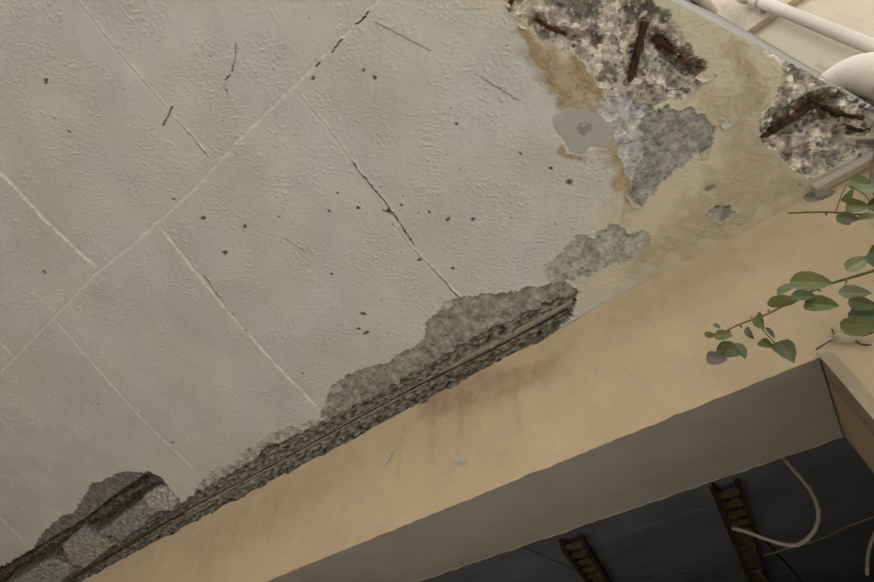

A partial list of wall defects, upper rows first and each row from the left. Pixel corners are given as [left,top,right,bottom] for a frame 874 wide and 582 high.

crack [222,42,237,92]
crack [314,11,369,67]
rust [528,37,605,102]
crack [162,106,207,155]
spalling [503,0,735,209]
spalling [756,50,874,178]
crack [351,161,414,244]
crack [203,275,247,331]
crack [428,265,459,298]
peeling [194,221,651,493]
spalling [0,471,188,582]